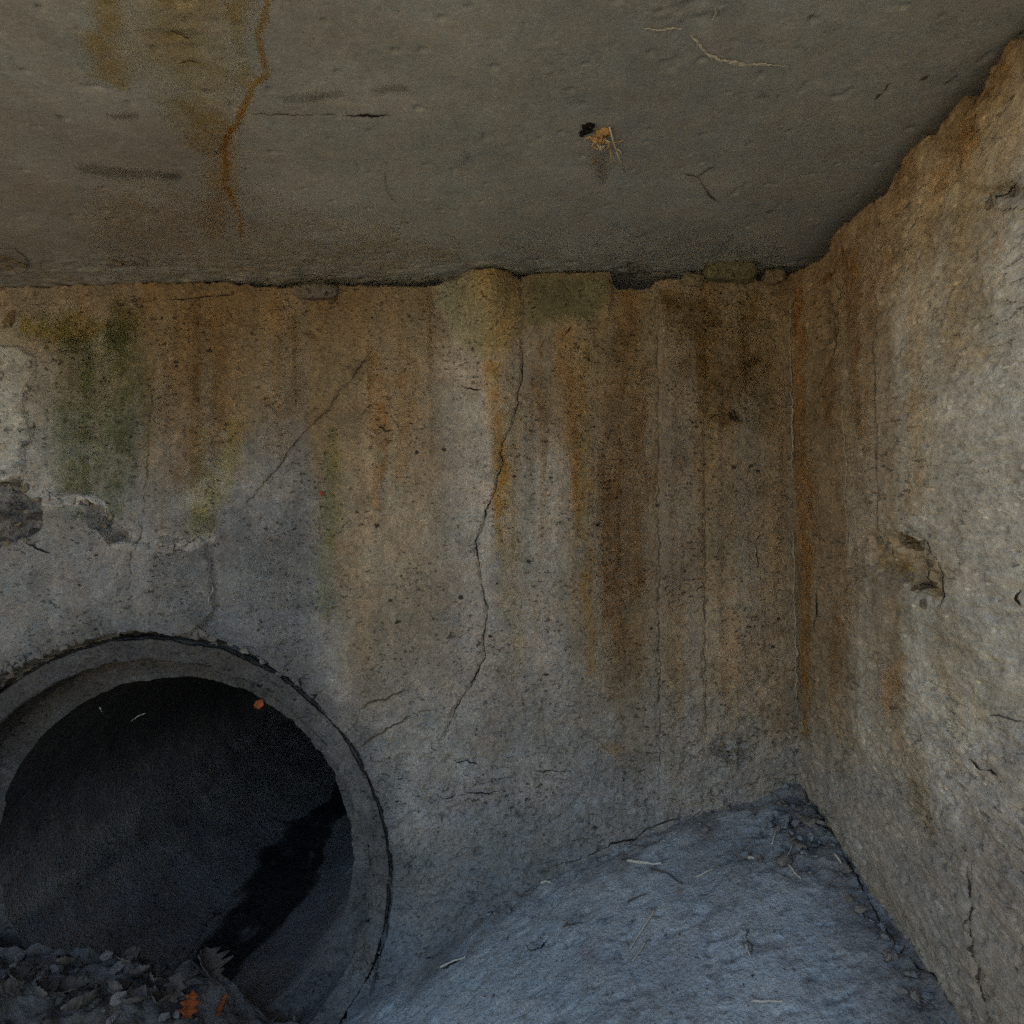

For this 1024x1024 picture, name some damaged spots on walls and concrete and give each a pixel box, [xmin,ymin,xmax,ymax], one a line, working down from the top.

peeling [0,345,209,556]
crack [239,345,374,511]
crack [431,347,523,765]
spalling [868,528,945,610]